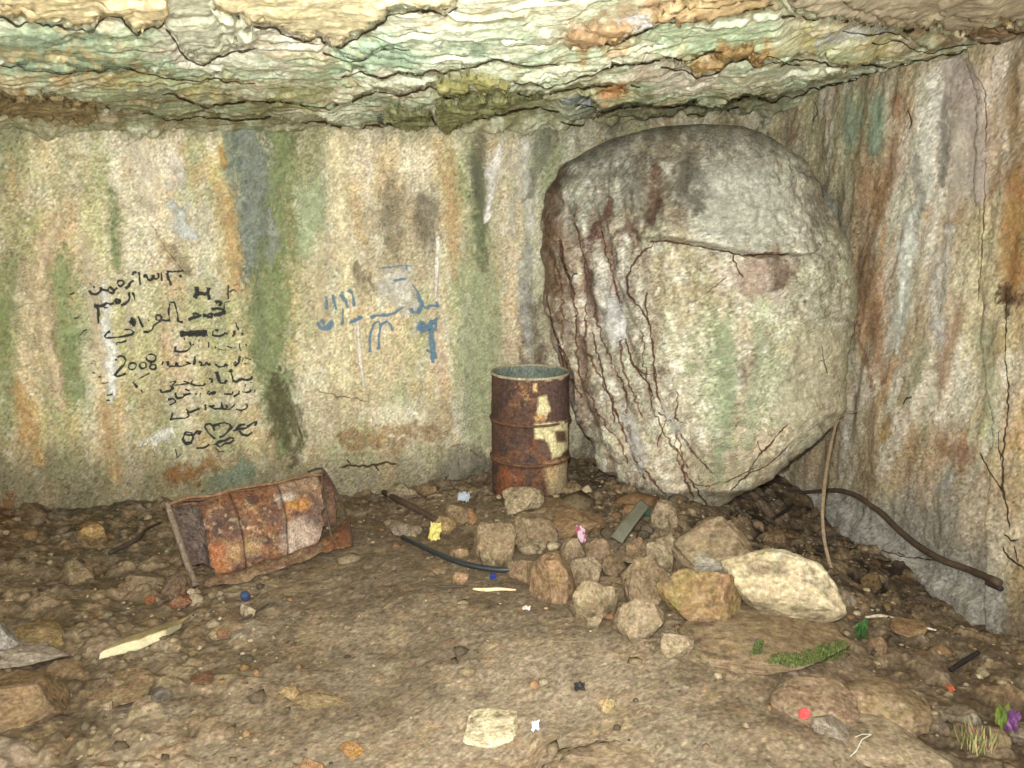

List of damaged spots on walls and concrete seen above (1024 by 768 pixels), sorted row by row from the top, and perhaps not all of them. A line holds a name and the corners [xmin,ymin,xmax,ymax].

damp [226,129,277,363]
crack [0,4,1024,300]
damp [267,366,307,469]
crack [339,460,397,471]
crack [980,303,1024,569]